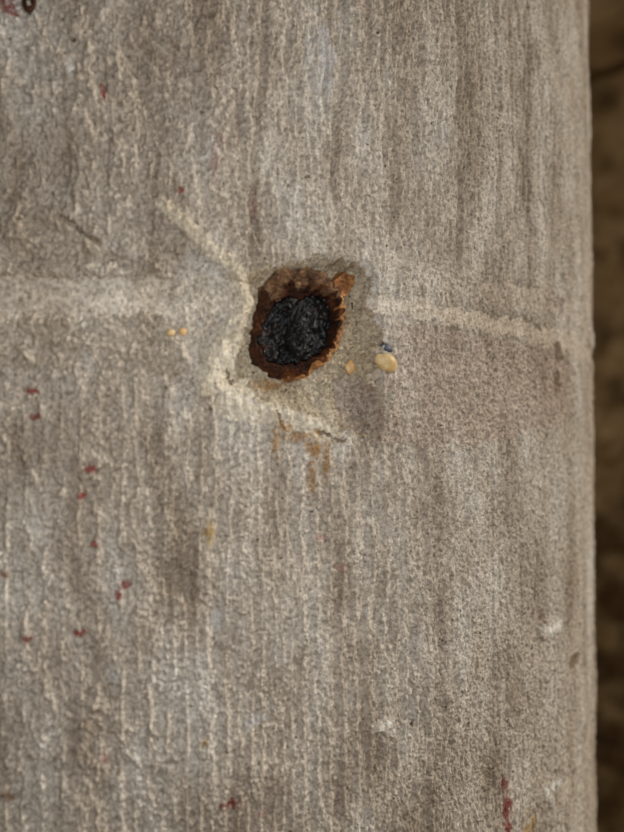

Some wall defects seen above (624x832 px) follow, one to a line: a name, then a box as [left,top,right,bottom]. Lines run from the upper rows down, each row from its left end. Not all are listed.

corrosion [260,271,355,389]